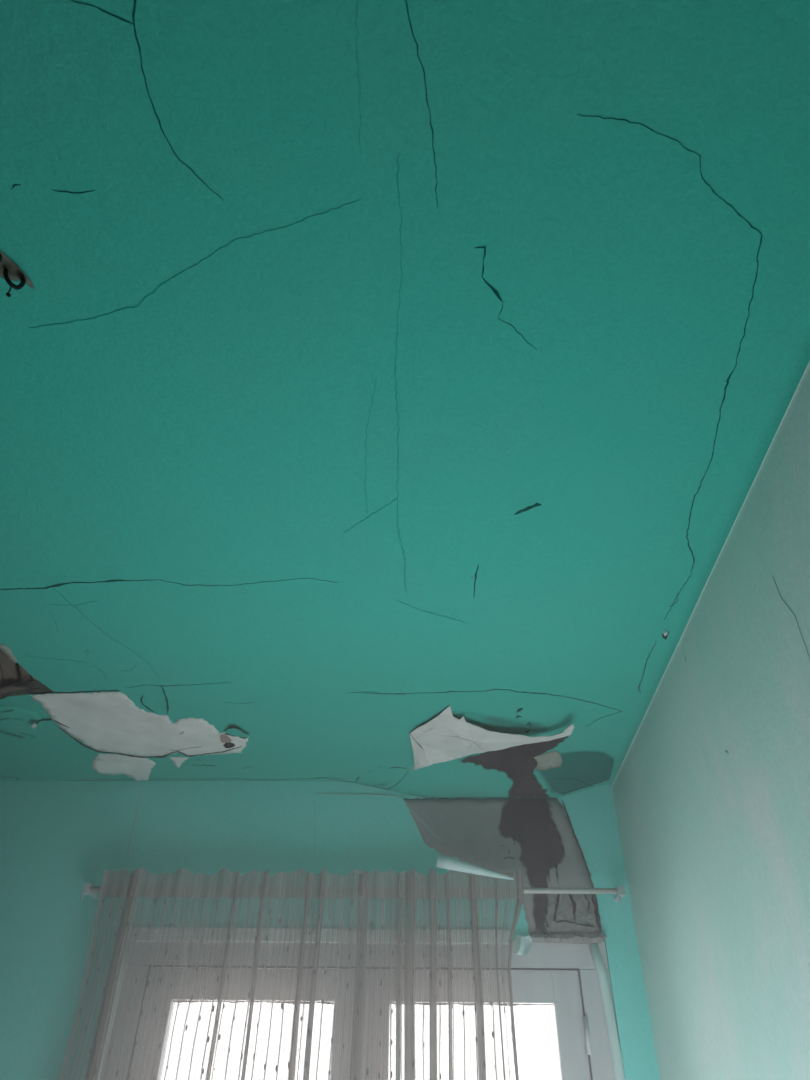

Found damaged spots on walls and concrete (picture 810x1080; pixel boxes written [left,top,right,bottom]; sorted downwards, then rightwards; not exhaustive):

crack [71,0,222,199]
crack [405,0,438,208]
crack [53,188,95,196]
crack [30,199,361,328]
crack [475,246,533,347]
crack [344,154,479,623]
crack [577,114,762,693]
flaking render [29,690,250,781]
crack [0,567,338,714]
crack [348,689,622,727]
peeling [410,705,574,771]
water stain [462,736,568,934]